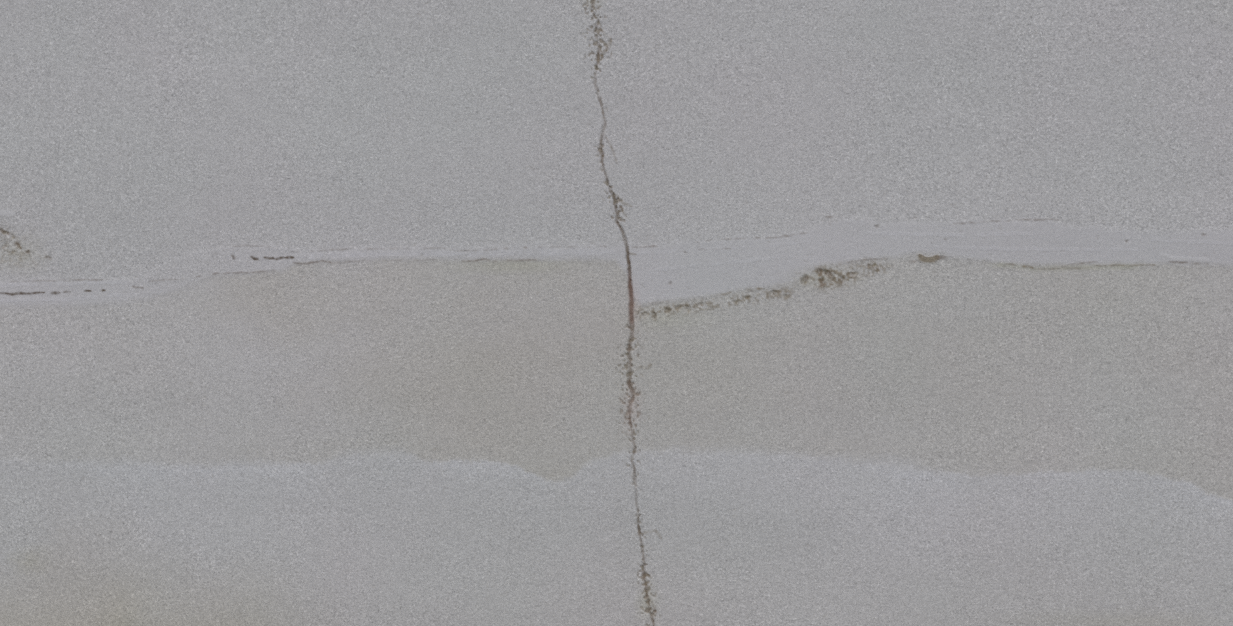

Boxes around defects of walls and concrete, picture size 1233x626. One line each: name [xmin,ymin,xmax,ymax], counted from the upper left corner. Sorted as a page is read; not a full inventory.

spalling [0,218,54,278]
spalling [915,253,949,264]
spalling [633,258,895,324]